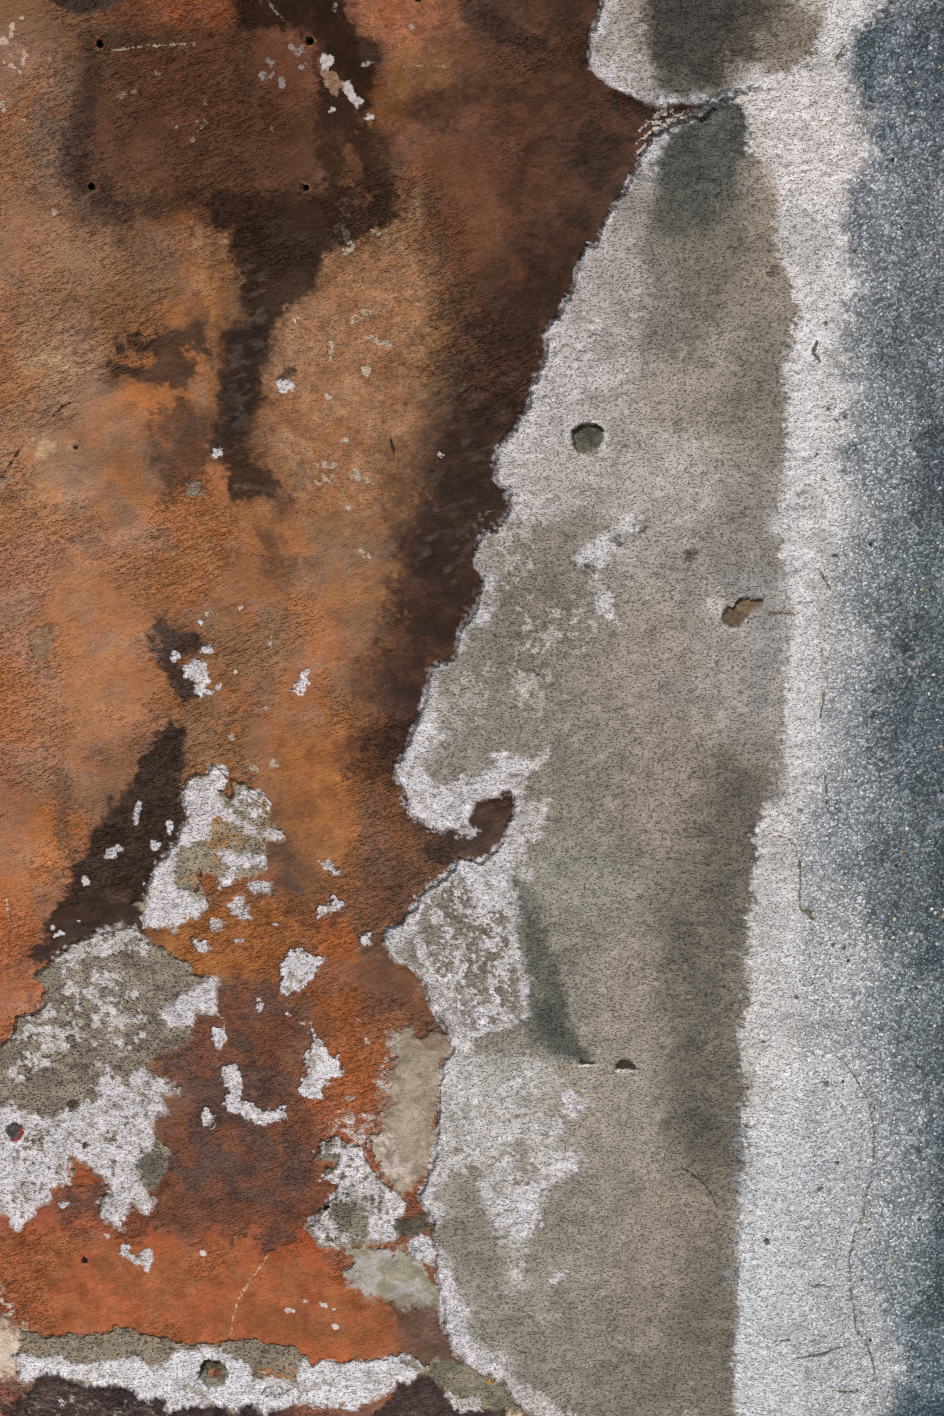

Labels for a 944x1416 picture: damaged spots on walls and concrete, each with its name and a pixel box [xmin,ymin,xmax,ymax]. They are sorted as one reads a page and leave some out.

peeling [258,42,375,122]
peeling [585,0,695,111]
peeling [704,0,824,103]
leakage [18,0,426,601]
leakage [0,602,220,979]
corrosion [243,713,366,870]
peeling [0,112,800,1416]
leakage [308,0,944,1416]
corrosion [157,894,315,978]
leakage [50,965,416,1258]
corrosion [322,1021,393,1126]
corrosion [0,1217,394,1363]